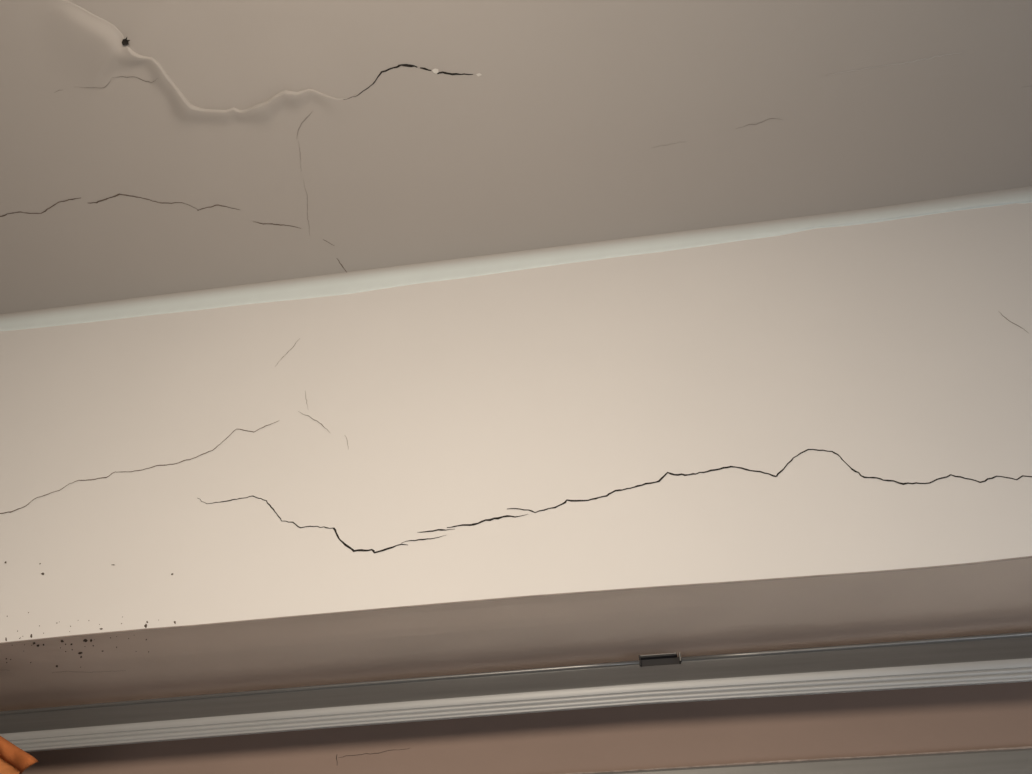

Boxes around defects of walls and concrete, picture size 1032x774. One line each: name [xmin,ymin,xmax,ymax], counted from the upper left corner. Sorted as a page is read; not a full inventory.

crack [344,64,473,100]
crack [0,112,346,271]
crack [0,392,348,514]
crack [198,449,1032,553]